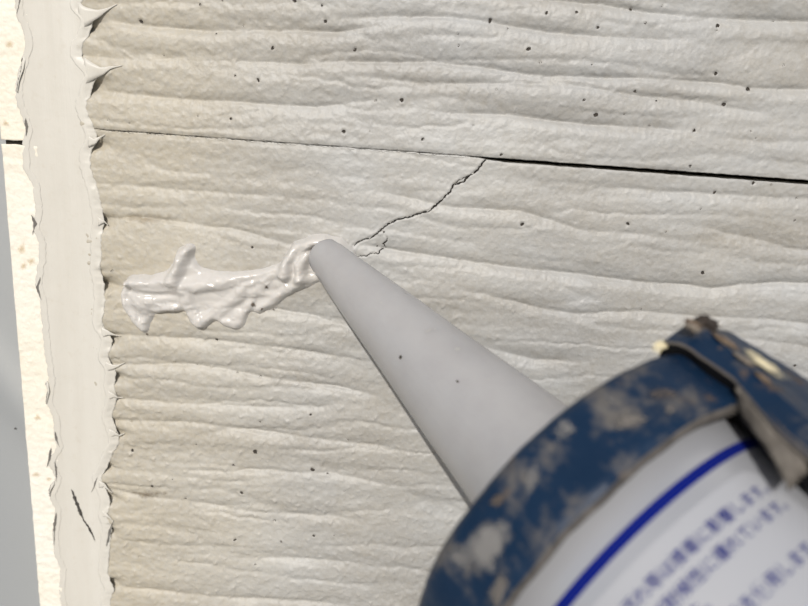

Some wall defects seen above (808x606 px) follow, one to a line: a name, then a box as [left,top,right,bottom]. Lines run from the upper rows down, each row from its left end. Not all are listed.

crack [100,129,488,257]